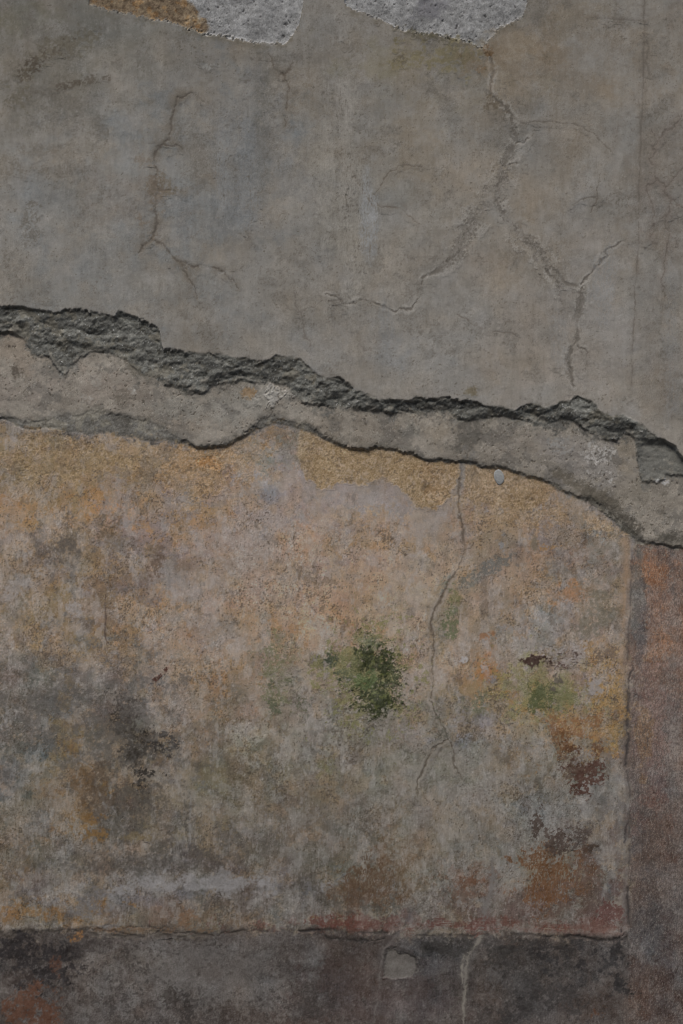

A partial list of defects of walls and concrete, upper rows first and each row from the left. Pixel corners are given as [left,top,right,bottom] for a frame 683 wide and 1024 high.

spalling [90,0,304,45]
spalling [345,0,528,43]
crack [130,86,243,309]
crack [313,0,656,406]
flaking render [0,306,683,483]
spalling [0,409,683,550]
crack [409,457,483,805]